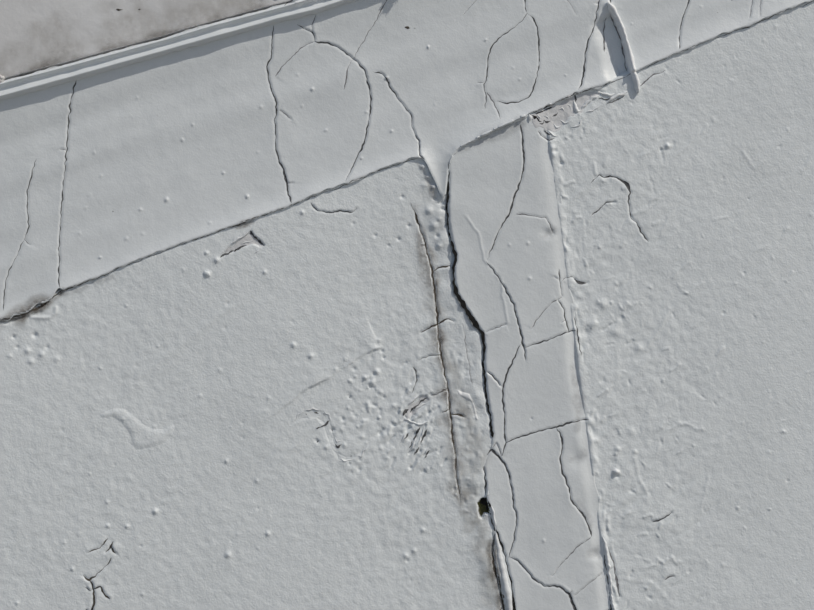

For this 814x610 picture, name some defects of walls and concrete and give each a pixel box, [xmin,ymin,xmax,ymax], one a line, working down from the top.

spalling [528,91,627,137]
crack [1,0,424,321]
spalling [216,230,265,262]
crack [411,0,814,610]
crack [84,539,115,610]